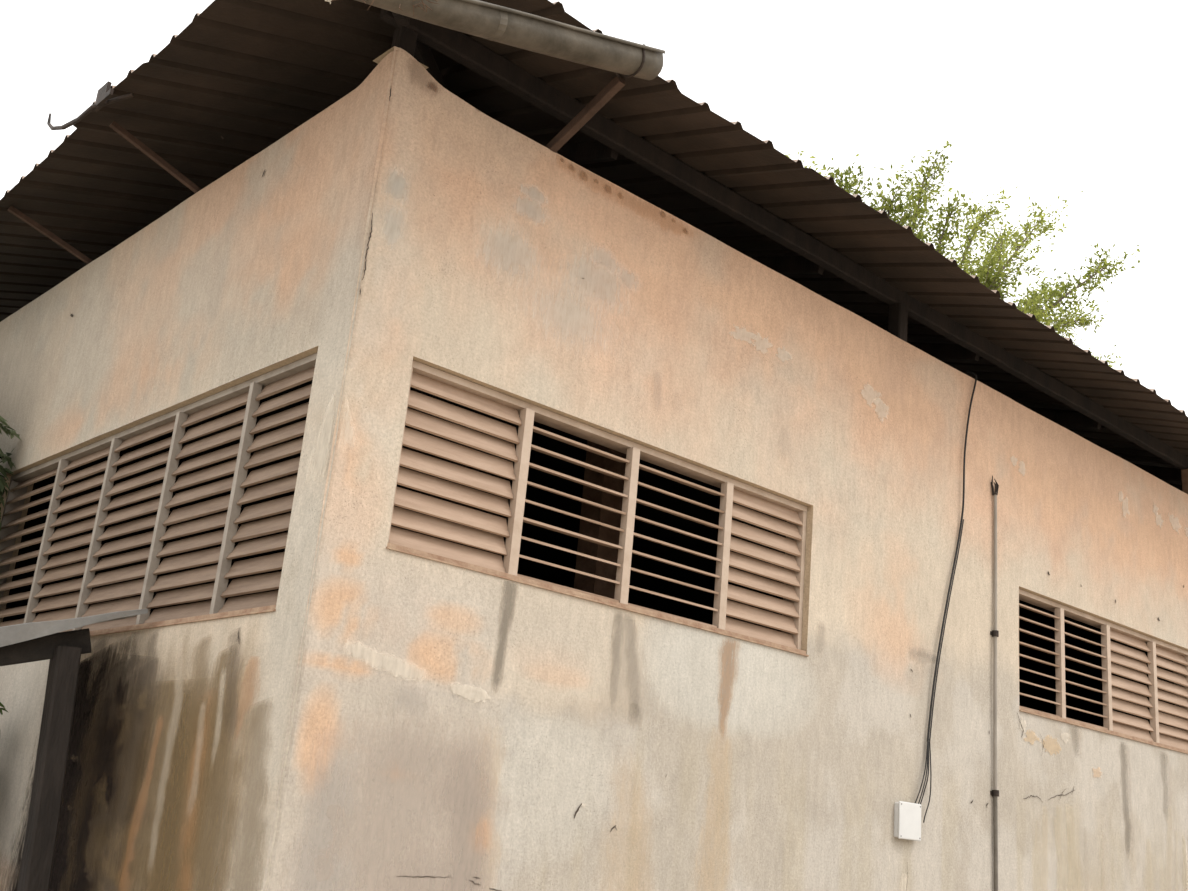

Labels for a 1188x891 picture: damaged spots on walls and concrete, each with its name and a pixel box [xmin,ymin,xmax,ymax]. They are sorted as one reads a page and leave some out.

crack [360,213,373,294]
leakage [493,582,516,686]
leakage [611,614,639,719]
leakage [5,767,34,891]
leakage [49,642,267,891]
leakage [1121,744,1130,851]